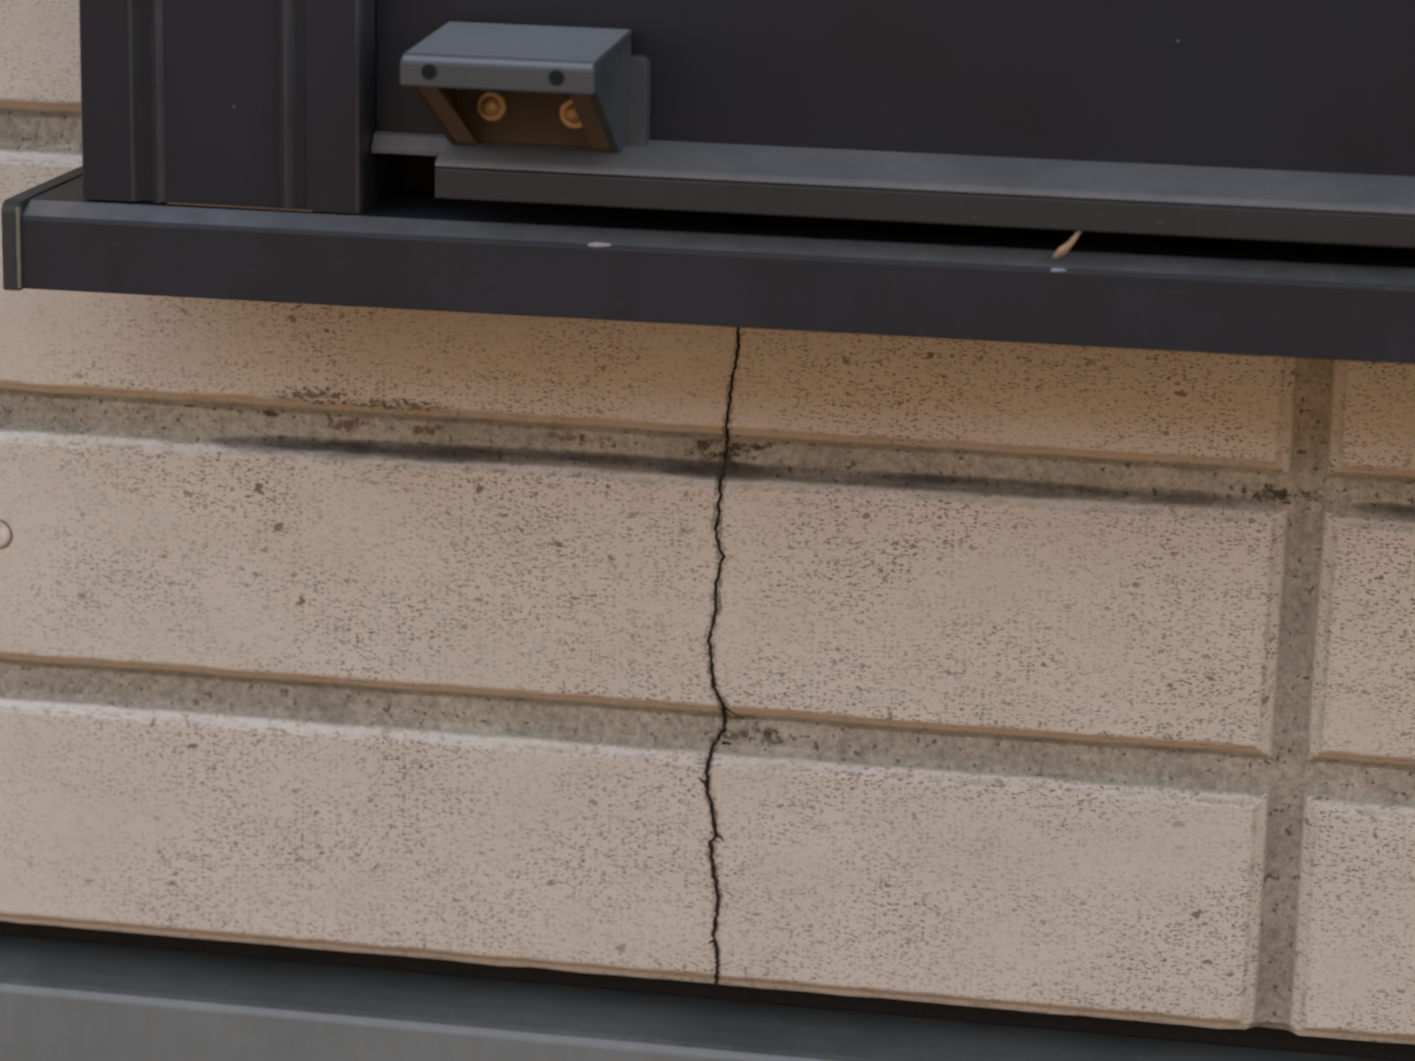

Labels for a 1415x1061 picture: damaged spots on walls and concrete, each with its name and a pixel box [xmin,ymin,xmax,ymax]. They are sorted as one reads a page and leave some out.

crack [698,327,744,985]